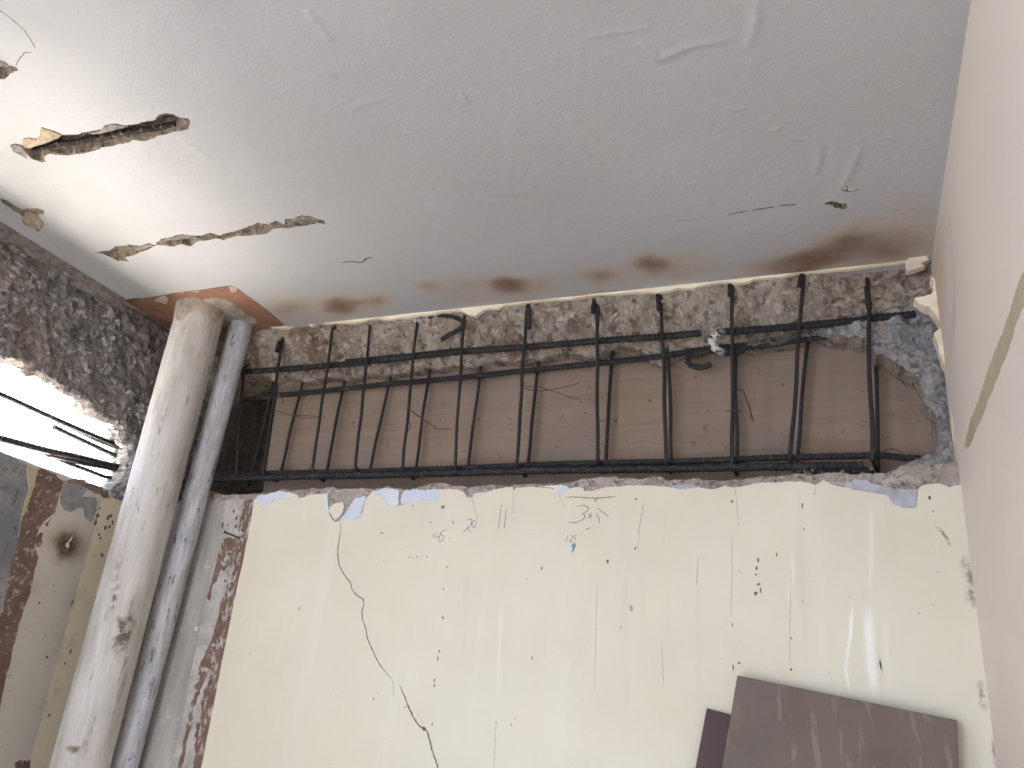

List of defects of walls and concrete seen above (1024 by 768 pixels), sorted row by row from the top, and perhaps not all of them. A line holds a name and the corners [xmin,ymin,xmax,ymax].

flaking render [0,60,18,79]
flaking render [10,113,190,162]
corrosion [257,175,942,326]
spalling [0,198,960,768]
crack [329,511,438,768]